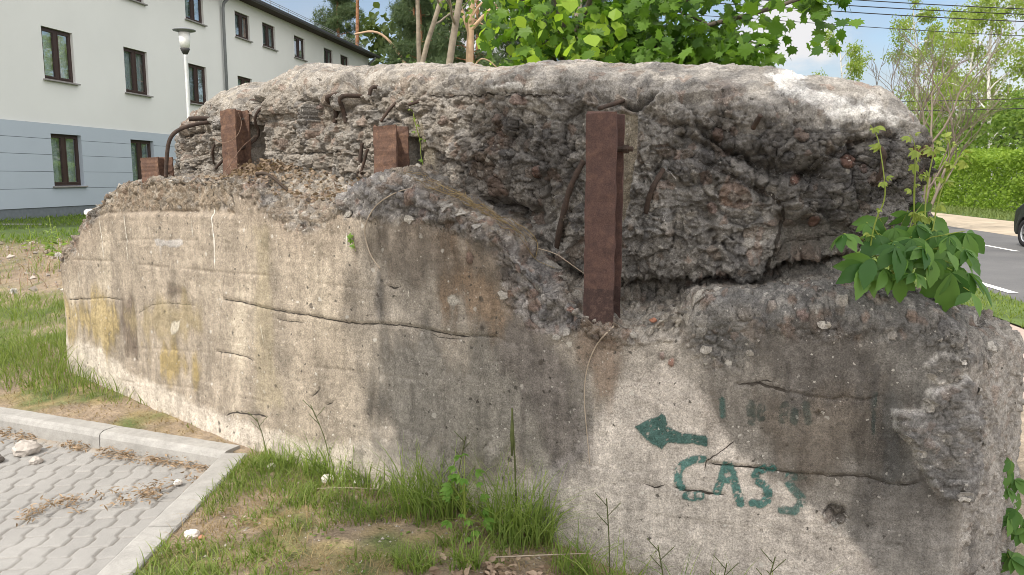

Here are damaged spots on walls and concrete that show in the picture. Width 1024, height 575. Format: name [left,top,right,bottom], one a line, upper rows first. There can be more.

spalling [623,95,656,112]
spalling [91,178,235,214]
spalling [334,168,584,341]
damp [64,288,138,357]
crack [225,299,504,340]
damp [346,211,592,491]
crack [738,380,809,397]
crack [644,442,918,495]